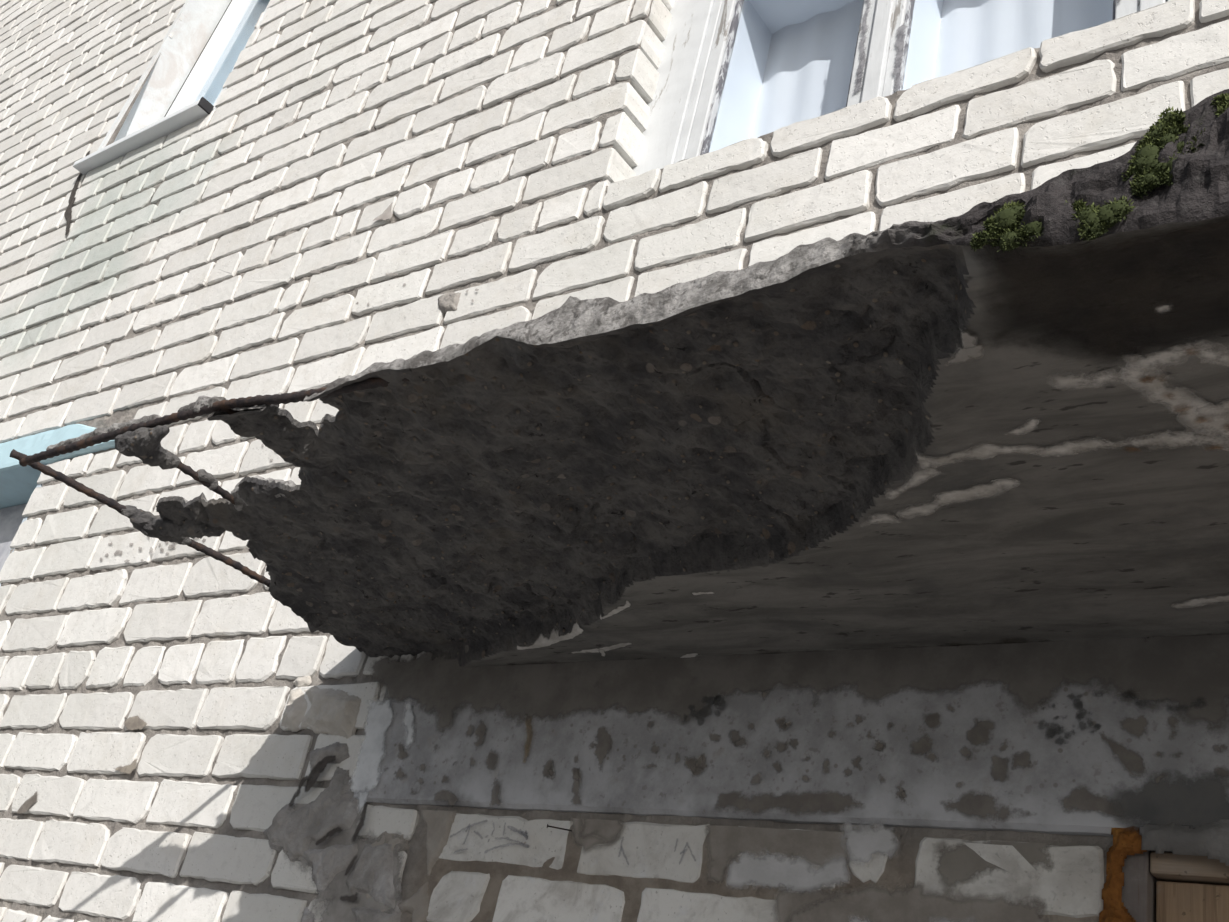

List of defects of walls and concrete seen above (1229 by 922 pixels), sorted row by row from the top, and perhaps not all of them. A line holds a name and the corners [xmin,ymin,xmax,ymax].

peeling [853,0,871,93]
peeling [893,24,907,91]
spalling [10,244,983,667]
damp [1010,419,1038,435]
efflorescence [870,479,1018,523]
efflorescence [1173,596,1229,608]
damp [351,634,1229,810]
peeling [264,676,402,922]
damp [1115,773,1229,829]